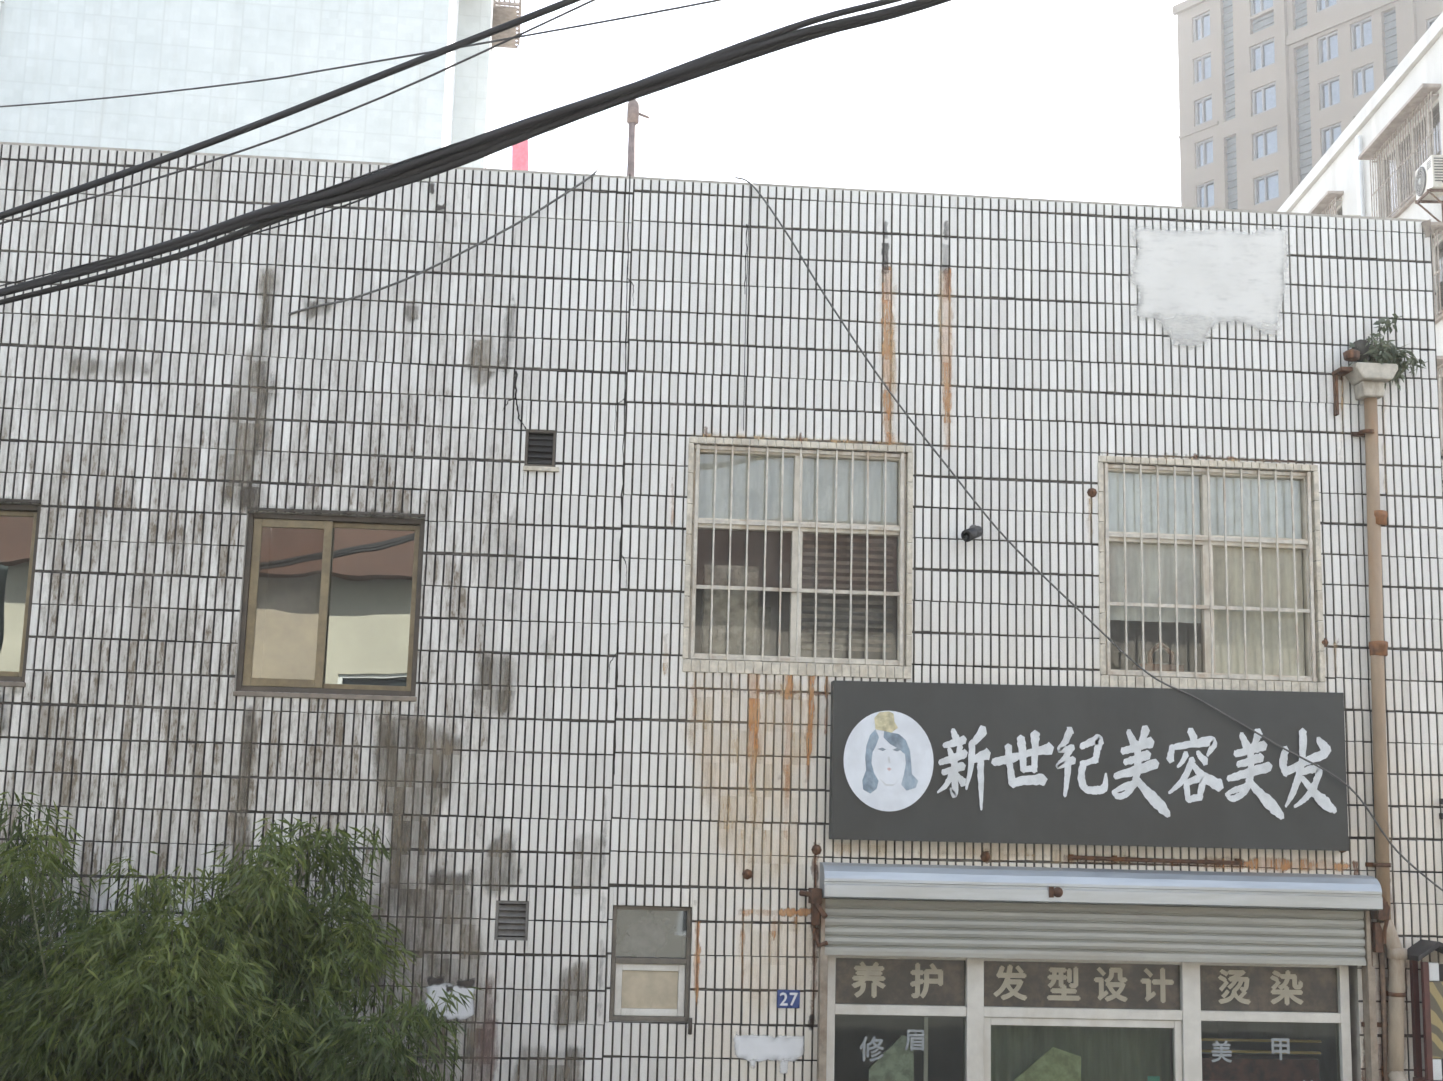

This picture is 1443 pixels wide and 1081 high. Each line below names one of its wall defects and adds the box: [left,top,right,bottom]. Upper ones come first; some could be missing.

damp [259,270,274,330]
rust [881,222,894,360]
rust [943,362,951,423]
damp [225,351,272,513]
damp [474,657,511,714]
rust [748,675,826,792]
damp [488,833,511,891]
damp [353,718,495,1081]
rust [772,908,818,966]
damp [556,963,601,1025]
damp [537,1048,580,1081]